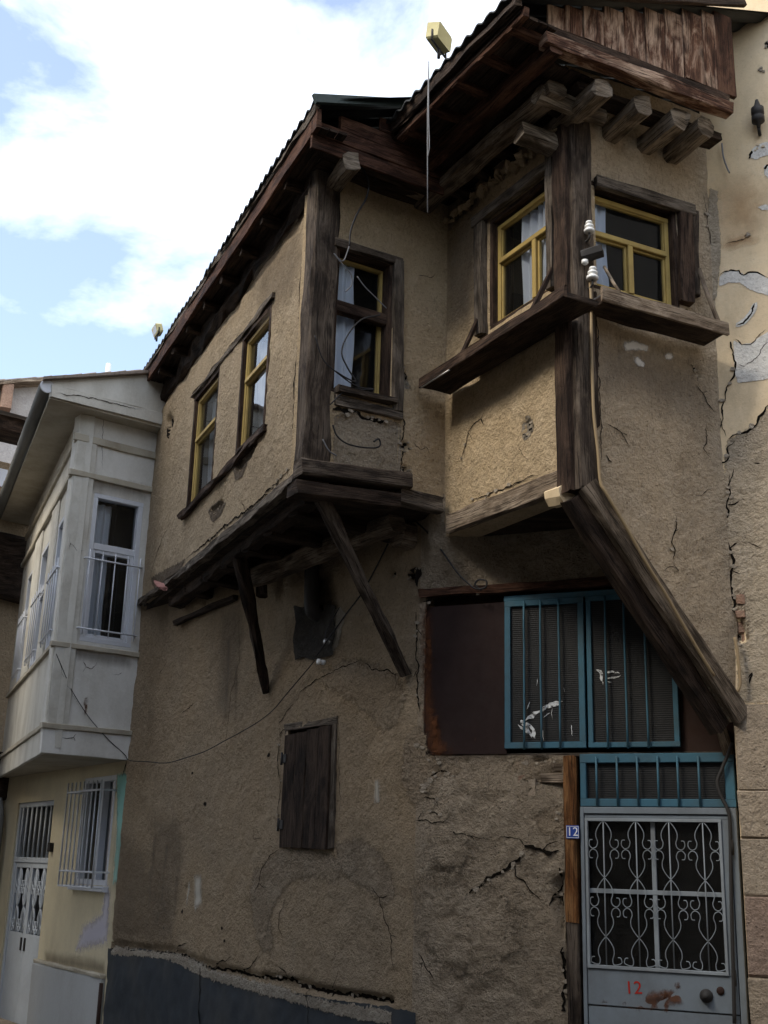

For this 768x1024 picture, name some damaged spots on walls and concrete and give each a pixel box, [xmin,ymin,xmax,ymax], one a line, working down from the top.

spalling [708,189,768,327]
crack [597,327,629,462]
peeling [733,332,768,383]
crack [471,449,537,501]
crack [691,303,768,611]
crack [665,518,679,572]
crack [253,593,480,942]
crack [416,770,565,921]
crack [373,889,395,969]
spalling [111,945,392,1024]
crack [559,947,567,1012]
rust [630,984,681,1008]